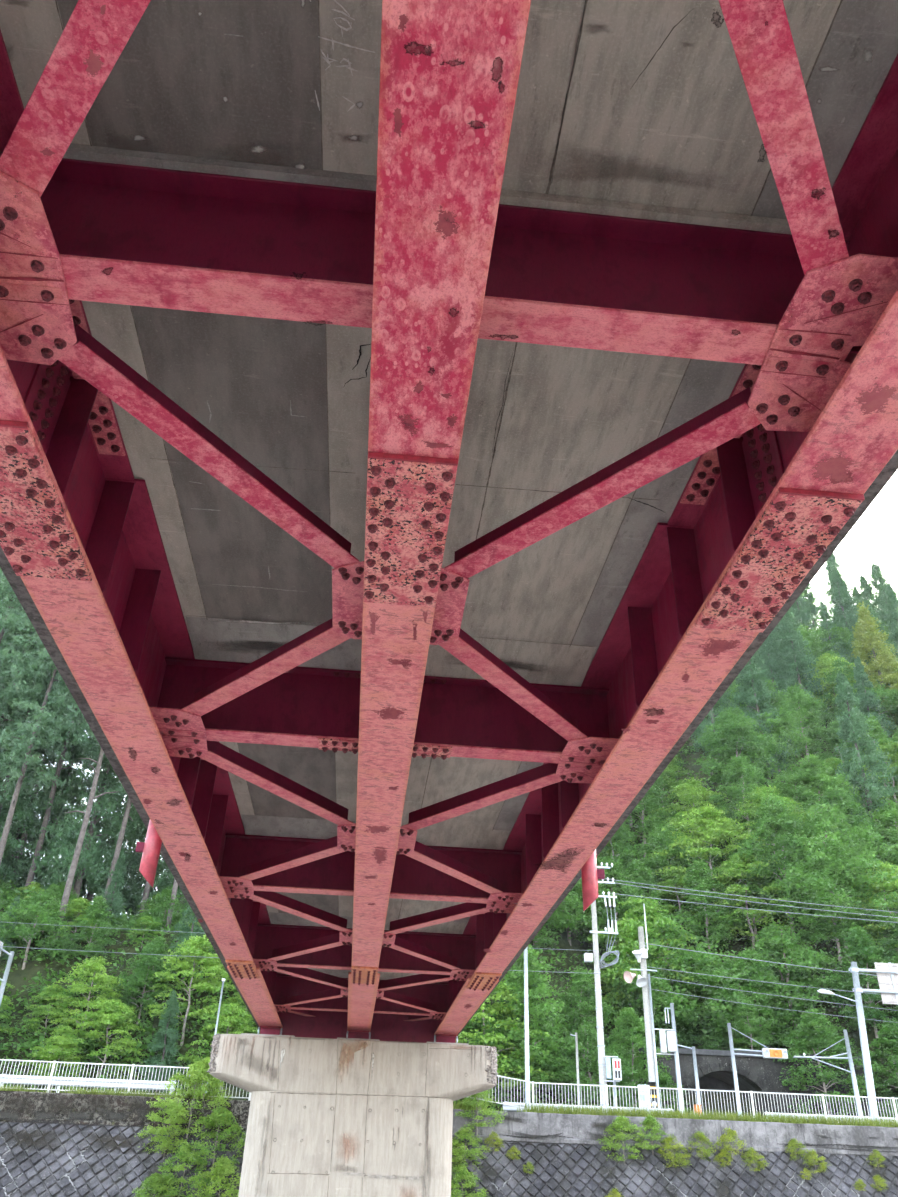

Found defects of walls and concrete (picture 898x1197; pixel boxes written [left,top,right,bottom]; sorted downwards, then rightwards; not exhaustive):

peeling [398,14,408,32]
crack [551,0,586,184]
peeling [393,108,404,137]
peeling [433,206,460,239]
crack [344,344,371,386]